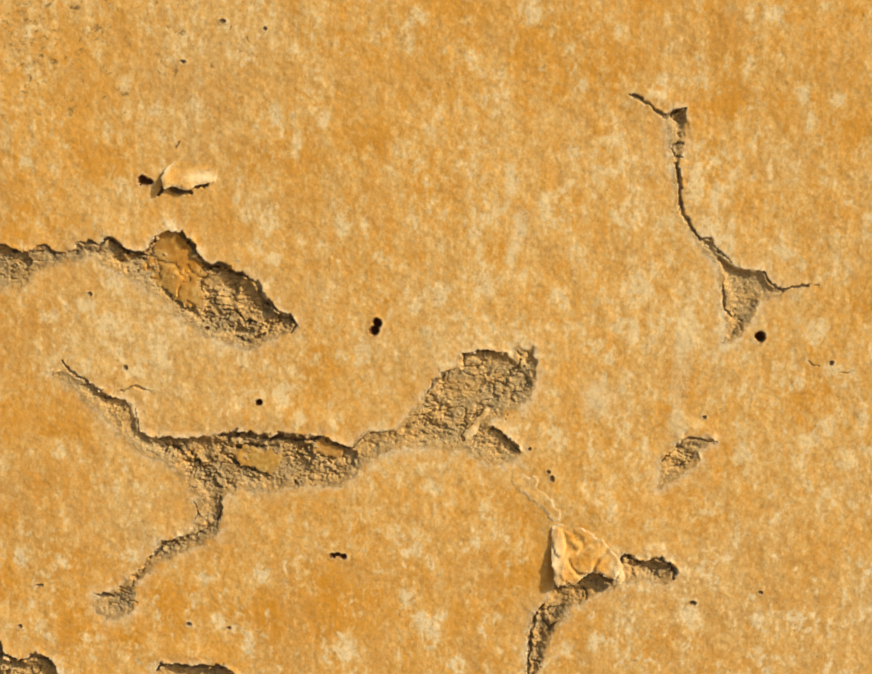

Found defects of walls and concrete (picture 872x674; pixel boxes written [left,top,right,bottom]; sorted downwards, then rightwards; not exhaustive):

flaking render [0,230,297,352]
flaking render [53,344,539,624]
flaking render [655,435,717,492]
flaking render [0,641,57,674]
flaking render [523,524,678,674]